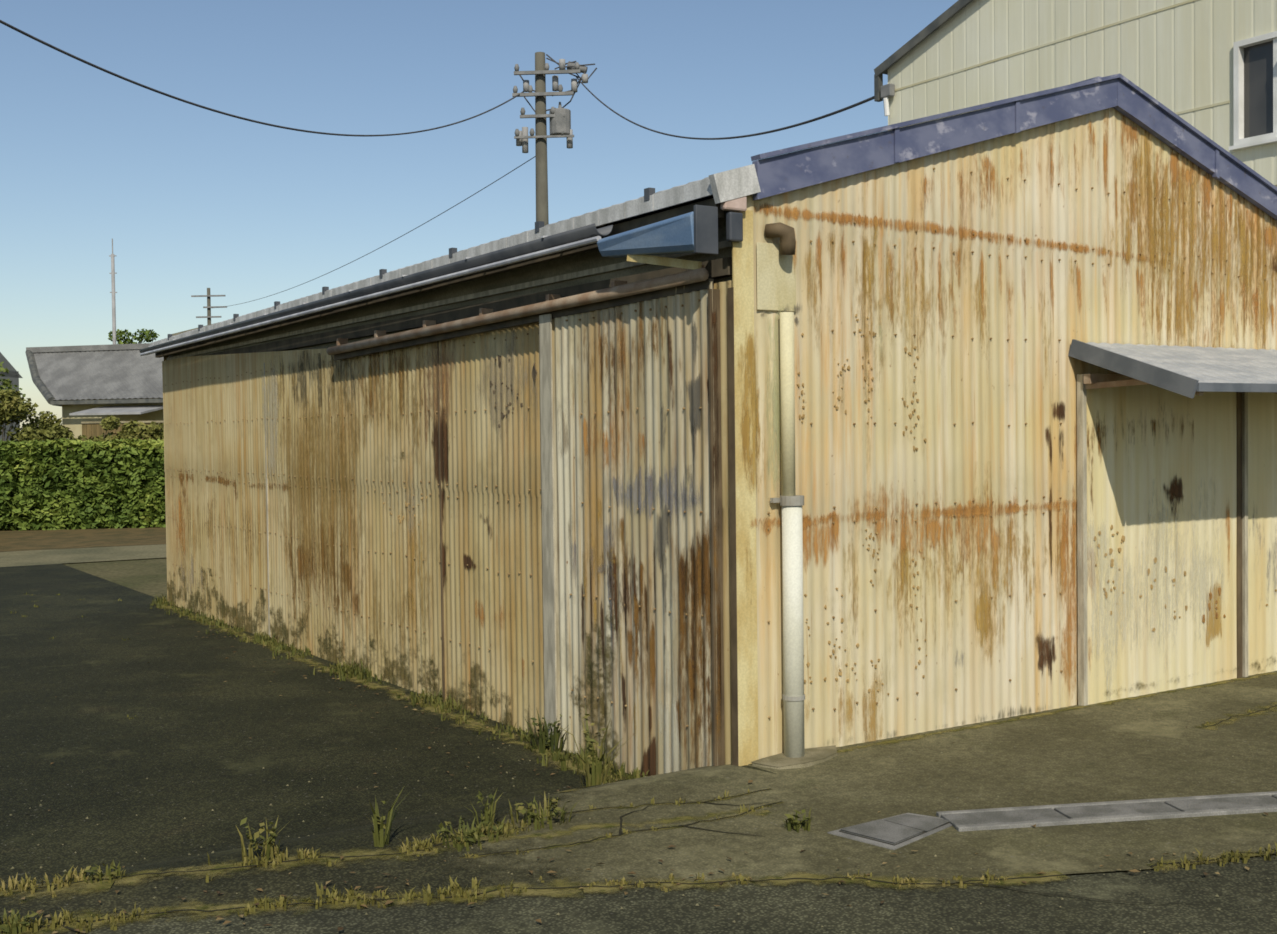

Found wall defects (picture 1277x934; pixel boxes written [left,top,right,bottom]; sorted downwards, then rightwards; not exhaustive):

rust [754,115,1277,341]
rust [1243,287,1274,345]
rust [359,350,454,521]
rust [676,511,722,768]
rust [802,511,839,564]
rust [856,491,1095,692]
rust [1164,475,1183,517]
rust [1202,586,1226,645]
crack [0,788,1210,934]
crack [1148,842,1277,872]